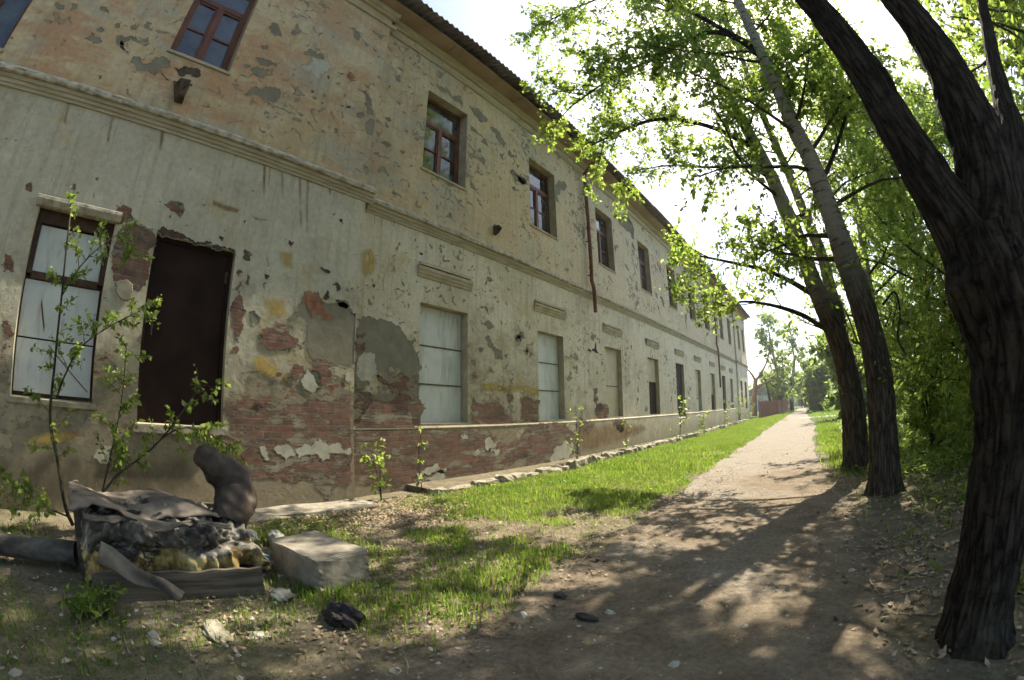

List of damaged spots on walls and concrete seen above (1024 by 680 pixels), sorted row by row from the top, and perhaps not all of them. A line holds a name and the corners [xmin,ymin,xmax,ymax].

flaking render [130,56,171,74]
flaking render [244,22,306,102]
flaking render [436,84,529,191]
flaking render [1,253,16,272]
flaking render [111,203,157,291]
flaking render [1,320,15,350]
flaking render [223,249,626,500]